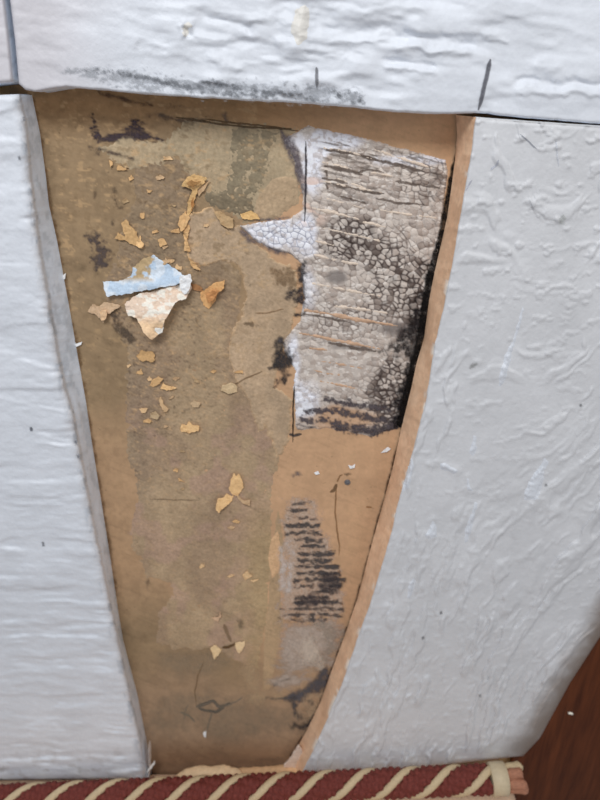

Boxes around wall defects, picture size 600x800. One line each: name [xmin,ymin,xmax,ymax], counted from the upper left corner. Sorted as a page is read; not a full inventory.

water stain [96,68,295,97]
water stain [281,131,307,192]
peeling [214,211,260,228]
peeling [88,174,225,340]
water stain [271,264,305,304]
peeling [127,350,155,368]
water stain [269,338,292,388]
water stain [300,264,429,437]
peeling [139,376,179,428]
peeling [180,422,199,434]
peeling [216,473,250,513]
water stain [271,503,346,730]